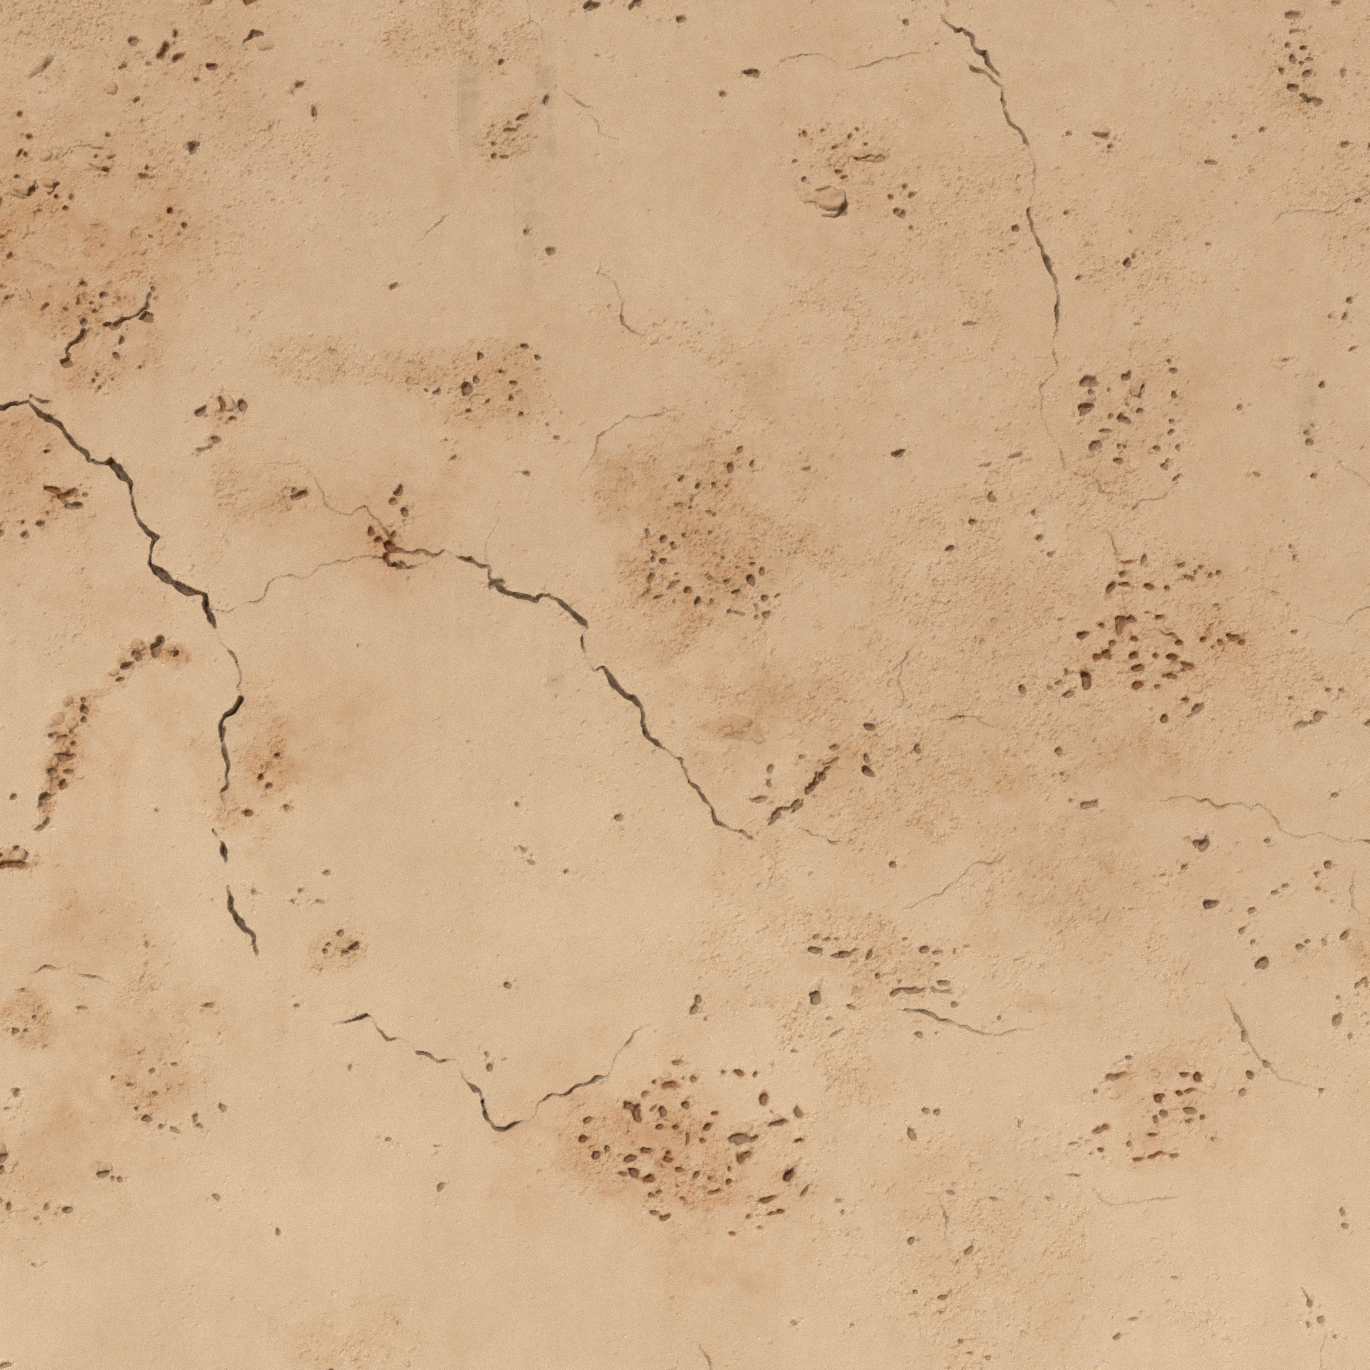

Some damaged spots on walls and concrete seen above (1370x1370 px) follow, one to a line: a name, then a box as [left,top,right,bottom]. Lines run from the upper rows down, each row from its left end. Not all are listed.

crack [772,52,920,73]
crack [940,0,1185,619]
crack [0,394,847,962]
crack [1160,795,1370,926]
crack [331,1013,651,1132]